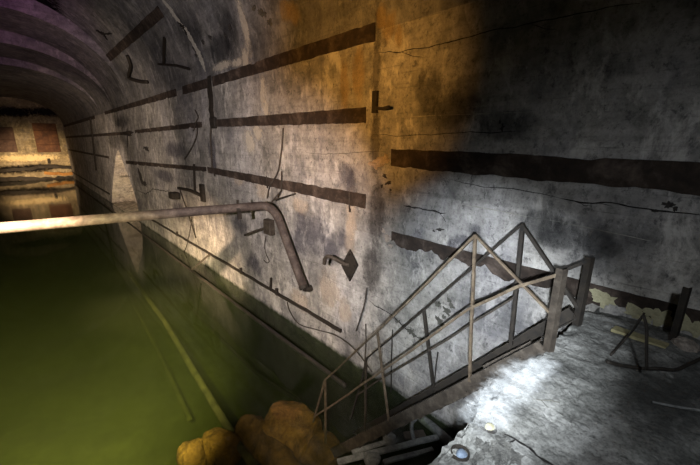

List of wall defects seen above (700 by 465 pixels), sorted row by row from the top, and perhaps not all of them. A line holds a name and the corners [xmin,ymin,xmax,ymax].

crack [379,3,640,58]
crack [451,179,699,215]
peeling [589,288,617,309]
spalling [606,302,700,372]